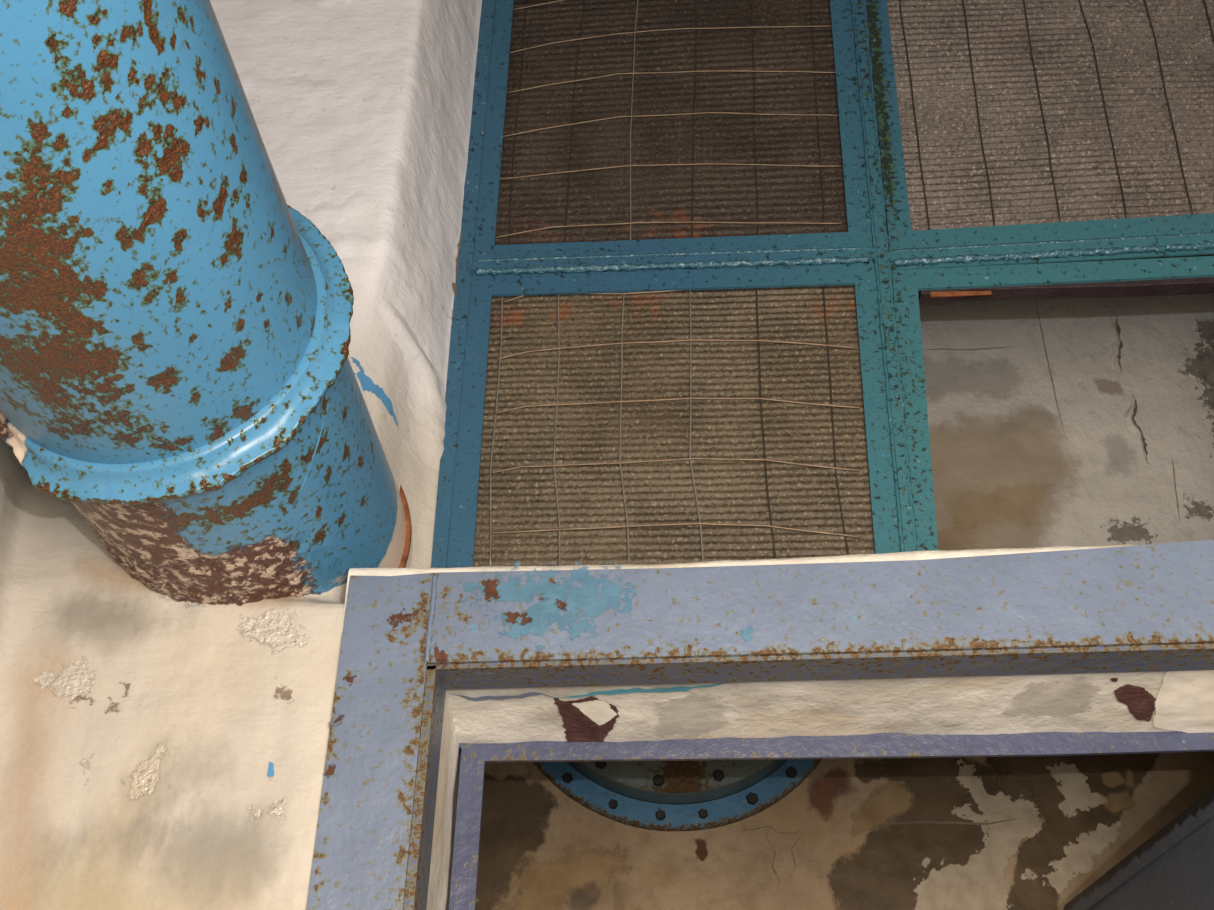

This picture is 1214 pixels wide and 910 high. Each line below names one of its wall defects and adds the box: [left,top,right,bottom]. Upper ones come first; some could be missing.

crack [1115,317,1123,368]
leakage [1179,318,1214,407]
crack [1132,394,1180,520]
leakage [1183,494,1213,521]
corrosion [387,608,416,628]
peeling [460,562,636,651]
corrosion [434,643,448,666]
spalling [554,696,620,742]
leakage [829,753,1159,910]